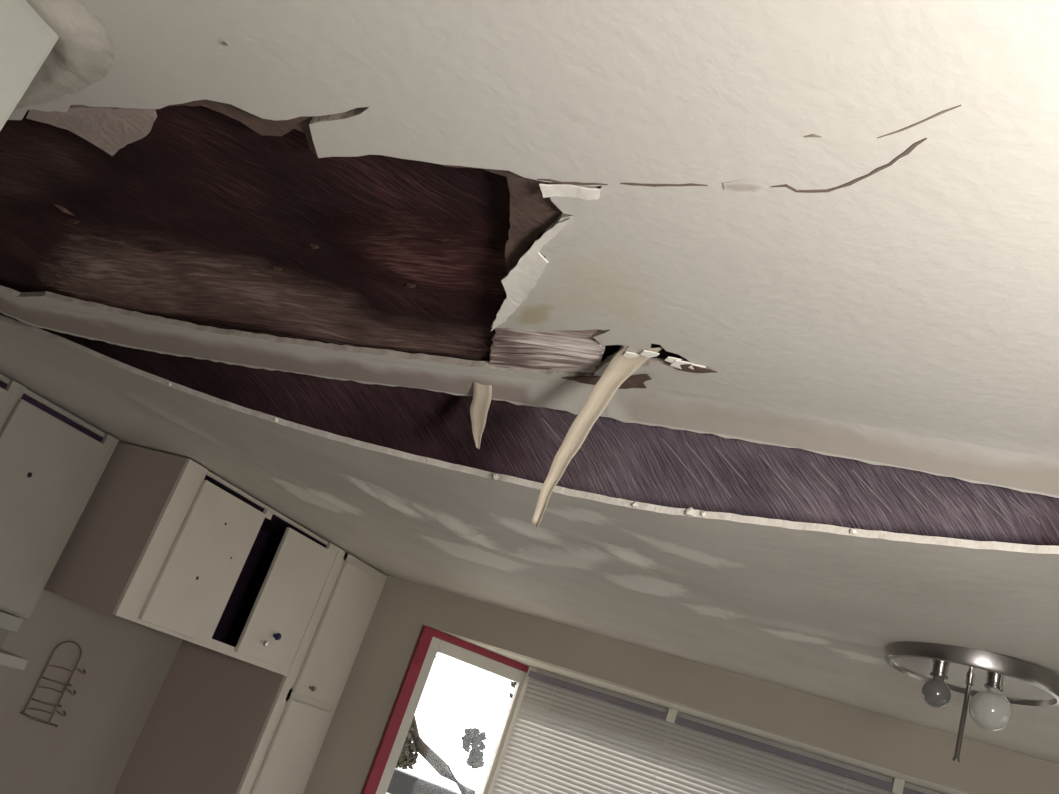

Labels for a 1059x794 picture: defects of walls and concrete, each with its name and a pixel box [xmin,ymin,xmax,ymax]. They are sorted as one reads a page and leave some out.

flaking render [26,105,157,156]
crack [538,105,961,193]
peeling [623,350,706,370]